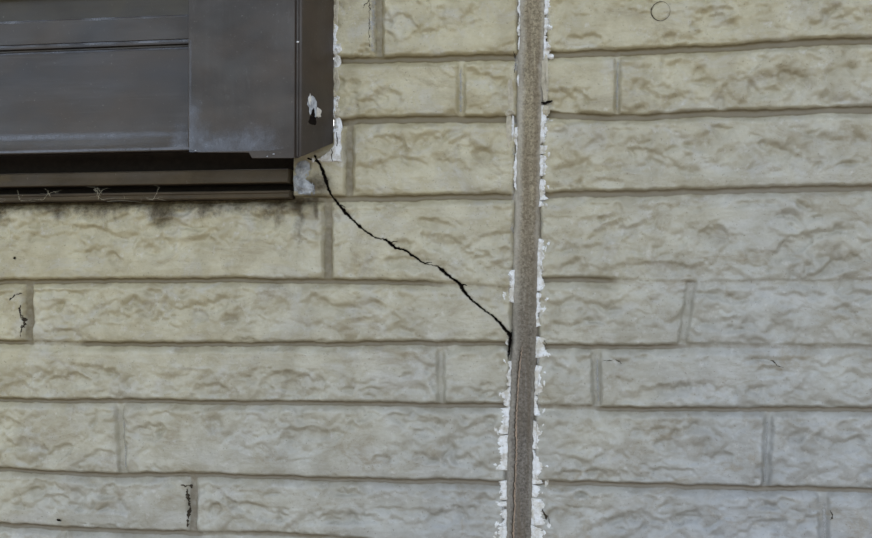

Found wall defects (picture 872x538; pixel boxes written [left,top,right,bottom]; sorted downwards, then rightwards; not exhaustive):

crack [9,293,28,337]
crack [307,149,547,538]
crack [181,484,193,527]